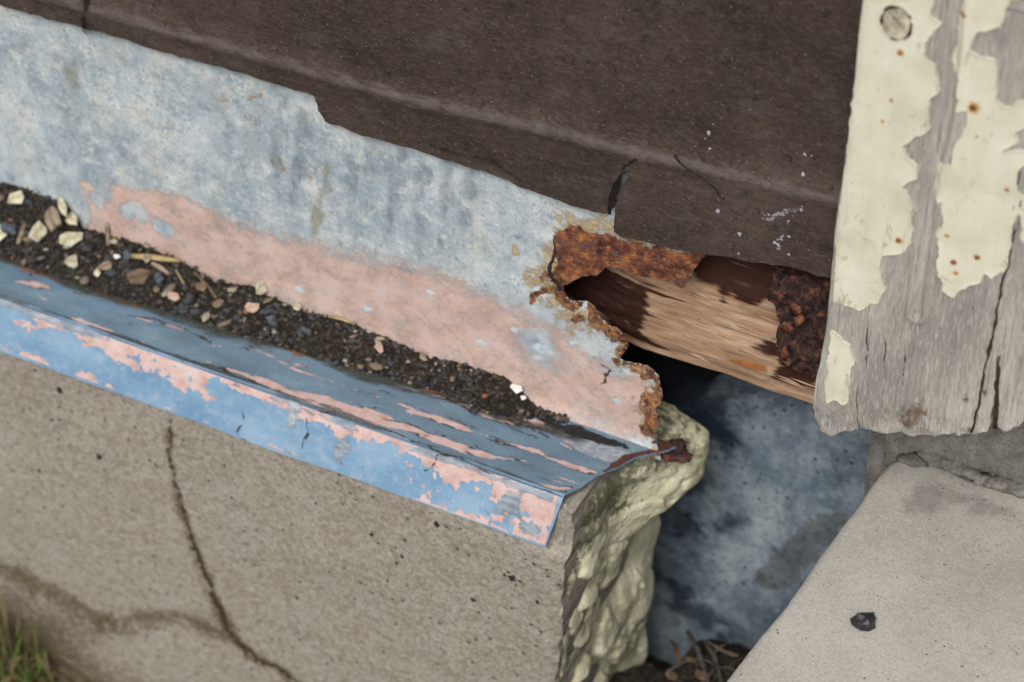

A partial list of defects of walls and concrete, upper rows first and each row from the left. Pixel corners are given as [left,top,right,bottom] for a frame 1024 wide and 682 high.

peeling [15,280,51,300]
crack [166,420,297,682]
peeling [0,299,597,545]
peeling [58,181,662,444]
rust [522,207,707,476]
crack [607,159,639,215]
rust [777,303,805,361]
peeling [824,330,855,405]
peeling [833,0,942,311]
peeling [935,0,1024,298]
crack [970,169,1021,433]